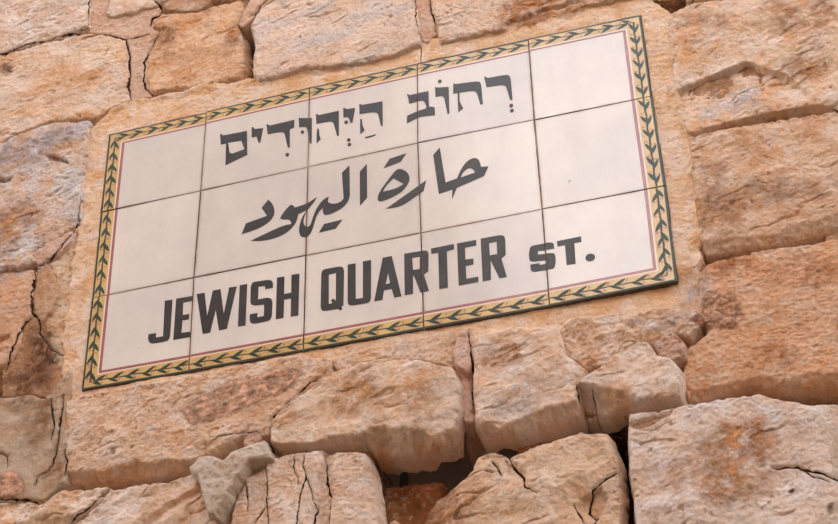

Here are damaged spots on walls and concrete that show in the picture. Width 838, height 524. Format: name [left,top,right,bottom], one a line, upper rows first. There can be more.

crack [0,397,68,523]
crack [71,487,111,524]
crack [209,371,332,524]
crack [574,474,617,524]
crack [772,466,838,482]